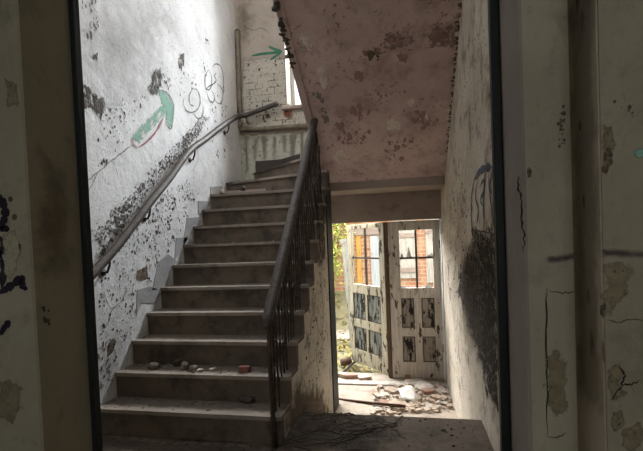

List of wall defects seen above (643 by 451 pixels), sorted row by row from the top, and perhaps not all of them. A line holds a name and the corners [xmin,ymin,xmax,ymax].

leakage [360,26,413,63]
peeling [83,54,197,152]
peeling [602,126,616,174]
peeling [92,117,208,260]
crack [517,176,527,251]
peeling [98,180,199,391]
leakage [458,221,499,411]
peeling [600,262,633,318]
peeling [546,350,568,415]
crack [545,291,575,438]
crack [610,367,639,400]
peeling [611,411,643,451]